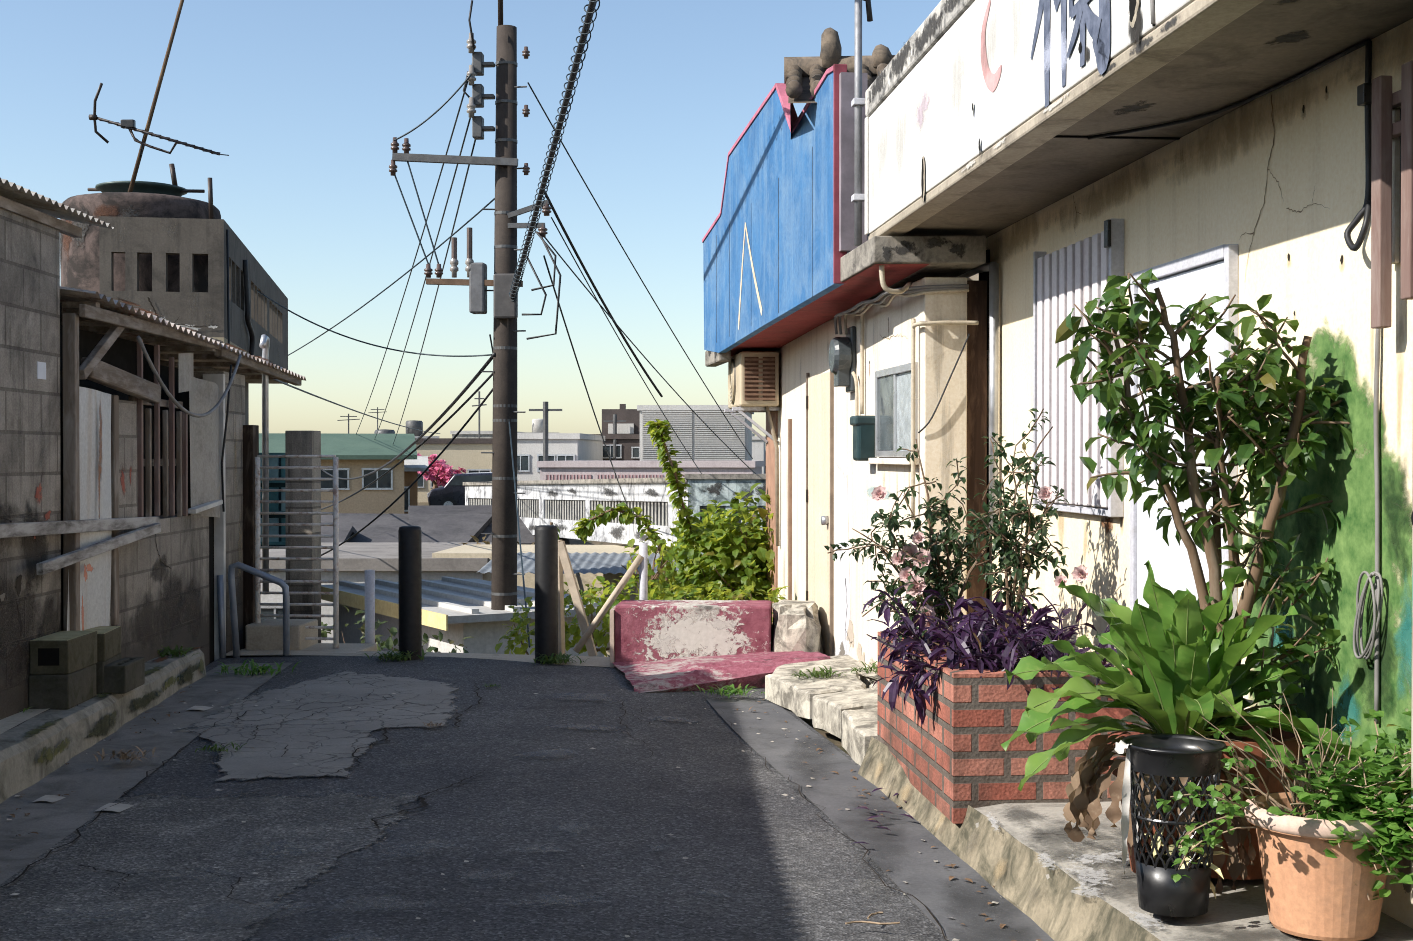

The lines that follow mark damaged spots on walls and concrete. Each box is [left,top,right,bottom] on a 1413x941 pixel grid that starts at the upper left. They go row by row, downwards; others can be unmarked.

damp [869,0,959,102]
crack [1241,95,1326,277]
rust [60,205,140,271]
peeling [771,463,878,675]
peeling [637,610,751,661]
crack [0,681,484,912]
crack [313,770,583,834]